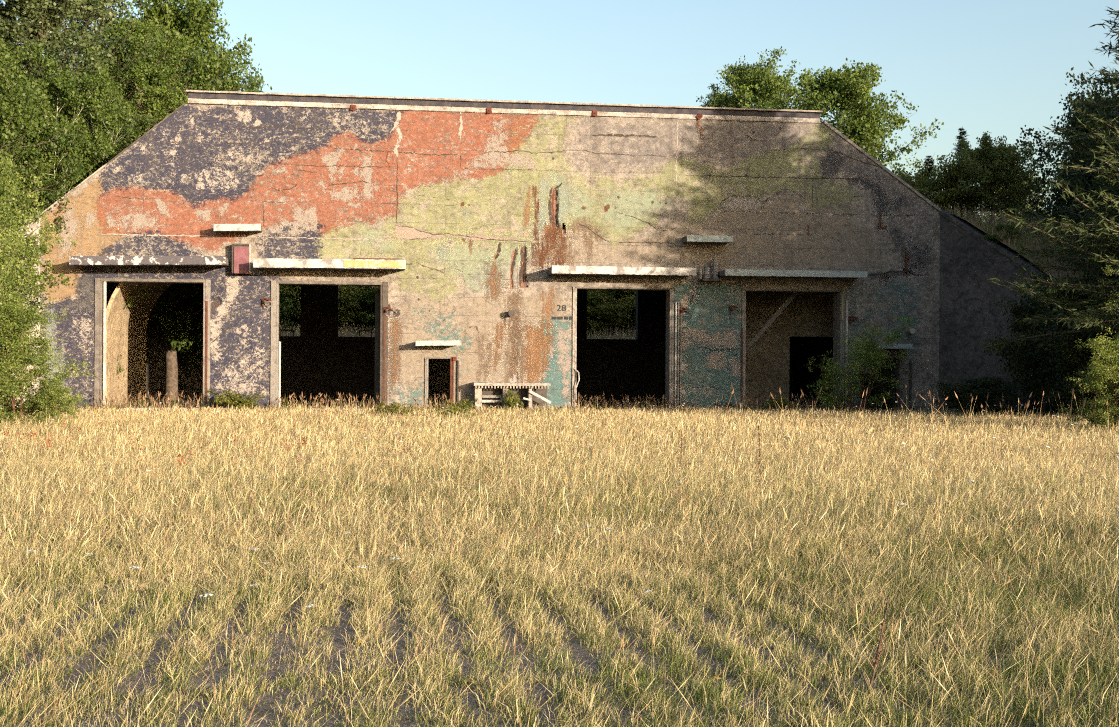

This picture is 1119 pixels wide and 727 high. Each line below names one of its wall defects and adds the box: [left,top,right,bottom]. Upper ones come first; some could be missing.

peeling [210,273,269,398]
peeling [266,144,380,237]
rust [478,187,573,382]
crack [220,126,915,334]
peeling [673,282,742,407]